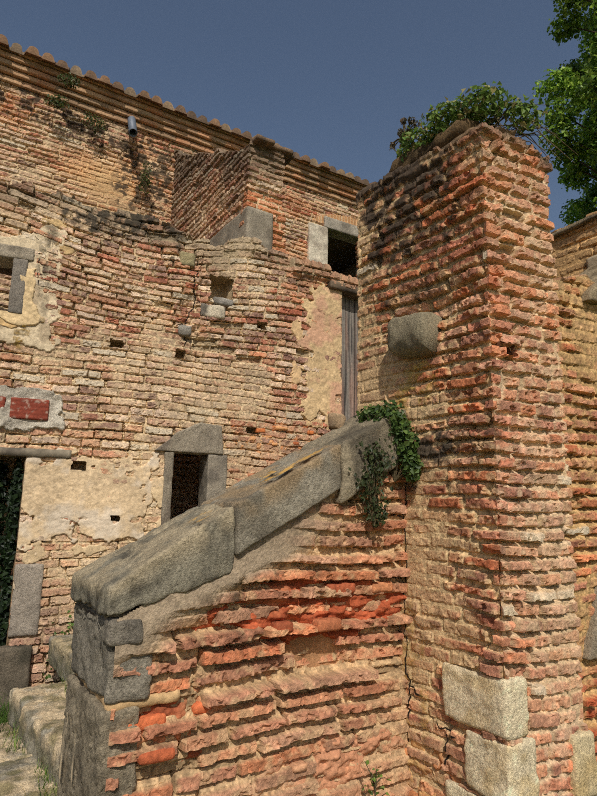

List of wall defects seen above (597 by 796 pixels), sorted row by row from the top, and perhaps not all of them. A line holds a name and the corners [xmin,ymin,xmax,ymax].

peeling [0,218,79,352]
damp [367,215,385,265]
peeling [227,277,342,483]
peeling [17,447,164,564]
crack [403,482,423,747]
crack [436,720,455,765]